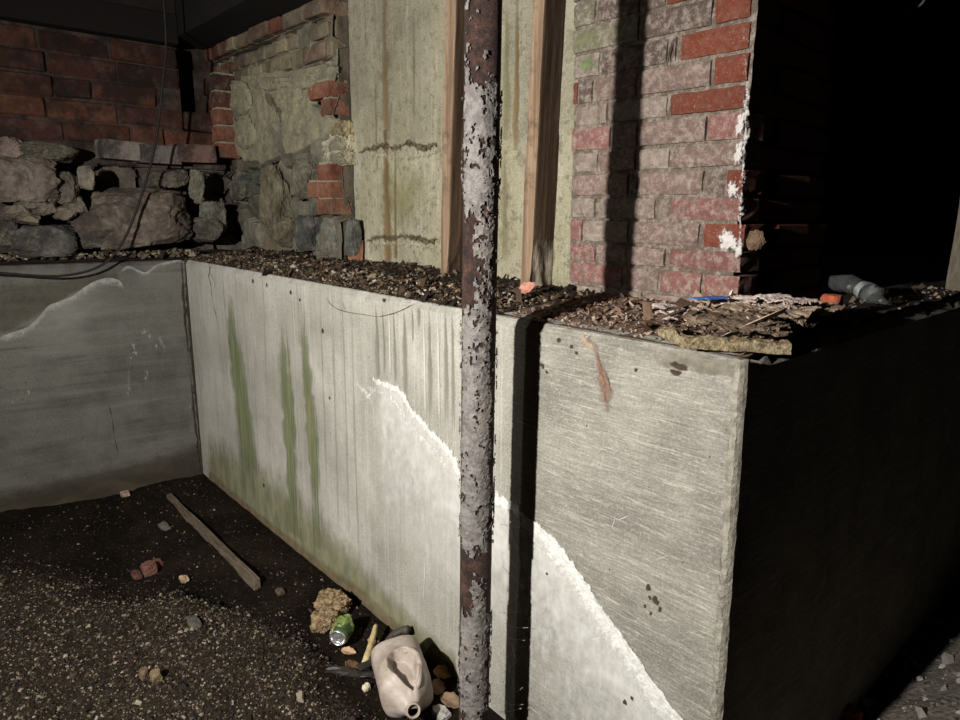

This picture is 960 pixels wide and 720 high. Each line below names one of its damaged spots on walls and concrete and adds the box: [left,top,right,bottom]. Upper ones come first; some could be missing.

efflorescence [719,85,750,257]
water stain [0,276,123,340]
water stain [0,312,407,635]
water stain [354,310,461,586]
corrosion [581,336,611,403]
water stain [419,644,456,680]
efflorescence [491,491,683,720]